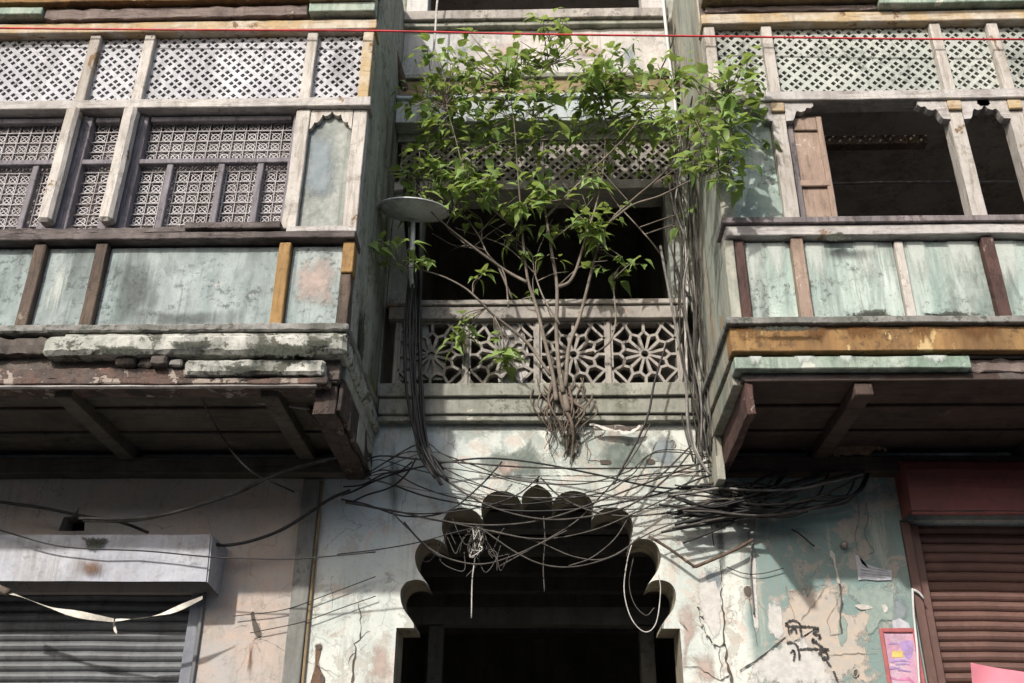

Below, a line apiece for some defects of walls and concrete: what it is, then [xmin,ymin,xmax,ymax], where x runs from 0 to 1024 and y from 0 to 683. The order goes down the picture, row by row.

crack [259,605,369,683]
crack [684,550,877,683]
peeling [742,553,905,683]